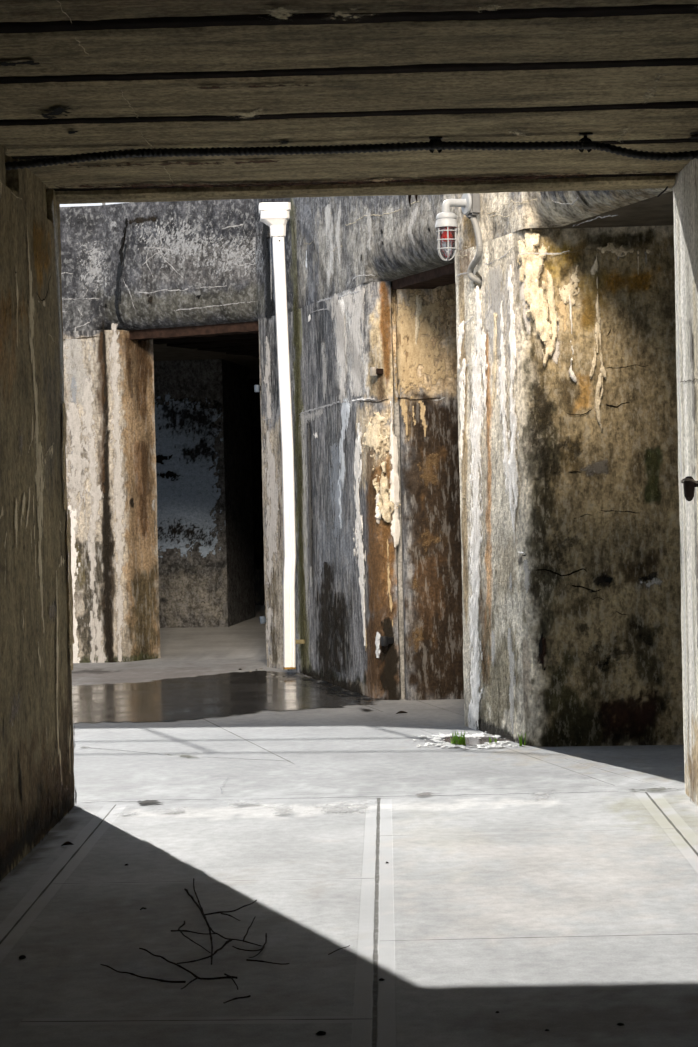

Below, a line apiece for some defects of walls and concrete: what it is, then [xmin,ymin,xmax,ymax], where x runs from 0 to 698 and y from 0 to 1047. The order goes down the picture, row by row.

damp [0,201,155,780]
damp [135,216,274,319]
damp [266,607,275,640]
damp [263,336,280,585]
damp [293,205,383,711]
corrosion [366,447,400,700]
damp [408,206,418,245]
damp [391,264,608,746]
damp [675,193,696,473]
damp [681,487,698,761]